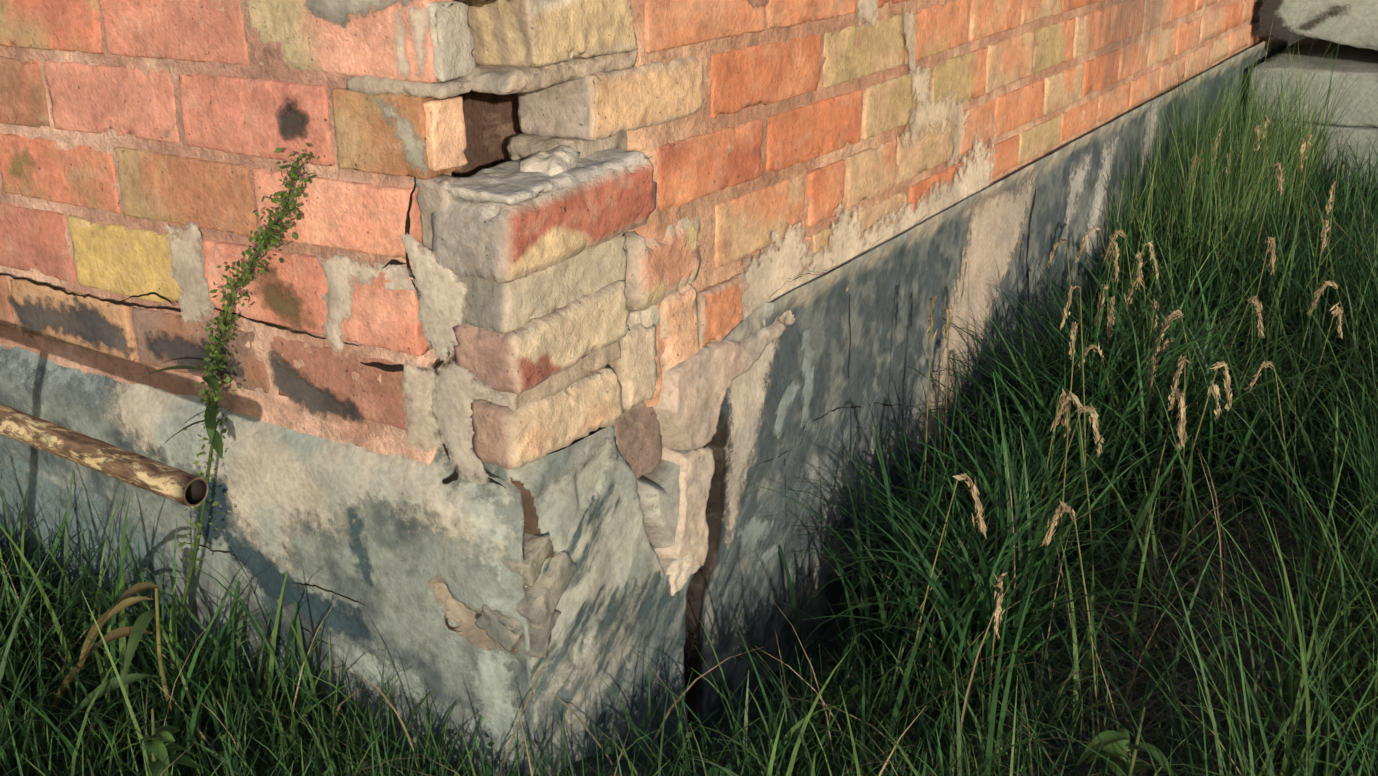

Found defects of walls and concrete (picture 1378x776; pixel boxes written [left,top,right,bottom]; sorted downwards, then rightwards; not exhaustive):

crack [0,273,506,488]
crack [357,176,421,301]
peeling [0,320,787,771]
damp [717,90,995,670]